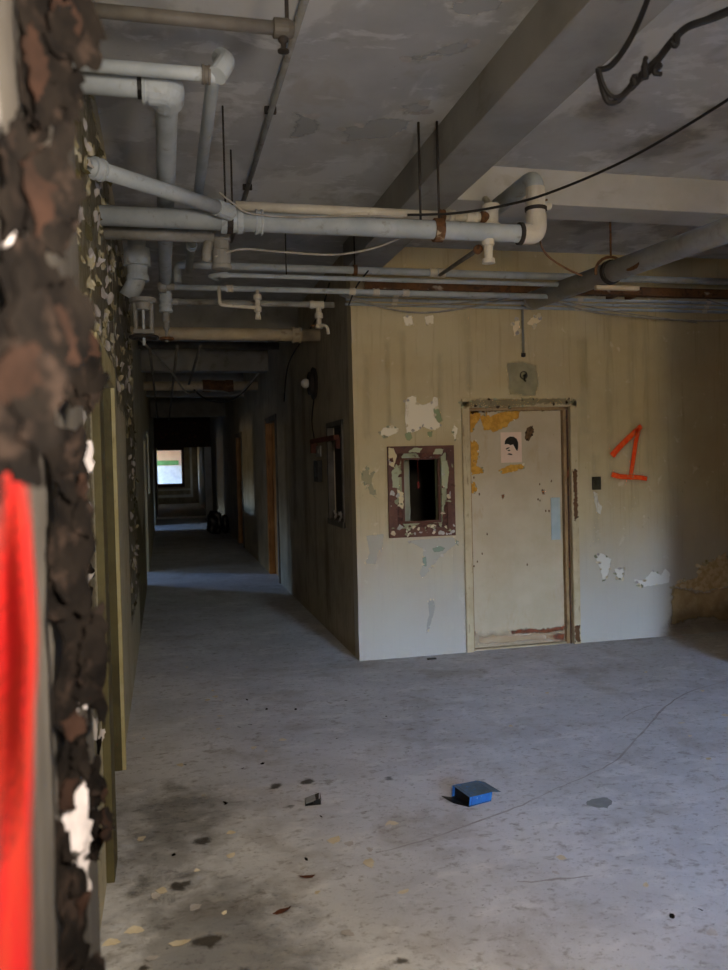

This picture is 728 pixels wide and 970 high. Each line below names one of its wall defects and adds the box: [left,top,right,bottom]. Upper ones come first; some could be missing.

peeling [378,395,458,441]
peeling [458,398,534,494]
peeling [0,0,140,970]
peeling [391,524,459,577]
peeling [594,552,728,624]